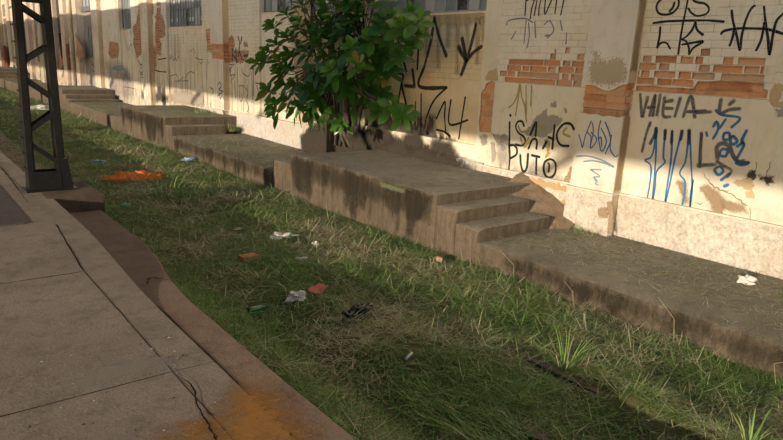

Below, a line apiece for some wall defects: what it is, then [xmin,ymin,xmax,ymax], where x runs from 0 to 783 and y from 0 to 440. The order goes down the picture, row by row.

peeling [108,41,119,58]
peeling [133,8,142,59]
peeling [151,0,166,68]
peeling [206,28,249,63]
spalling [479,48,783,161]
damp [700,185,746,213]
crack [175,368,217,440]